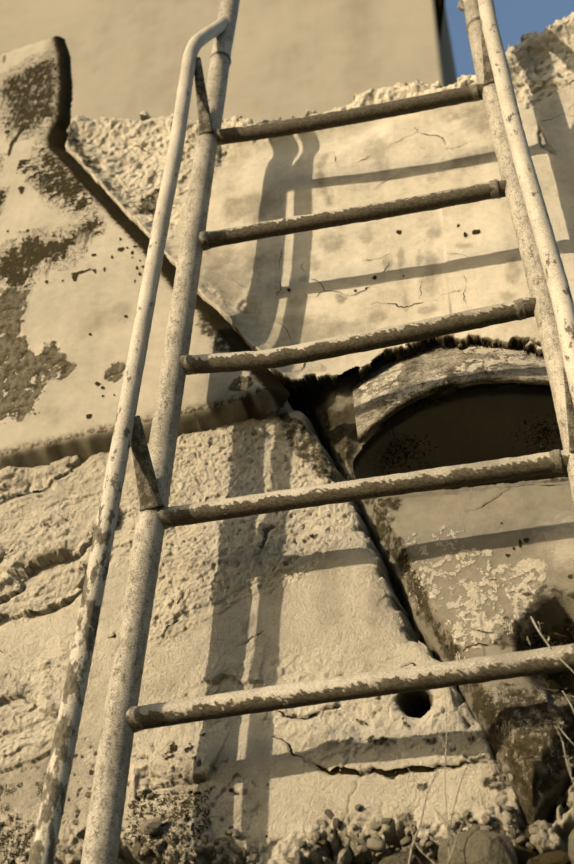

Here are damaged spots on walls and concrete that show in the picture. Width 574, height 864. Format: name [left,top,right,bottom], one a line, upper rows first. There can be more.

crack [301,252,466,307]
peeling [0,455,83,504]
peeling [0,506,99,620]
peeling [403,525,551,660]
crack [278,706,340,720]
crack [277,738,476,834]
spalling [168,840,210,864]